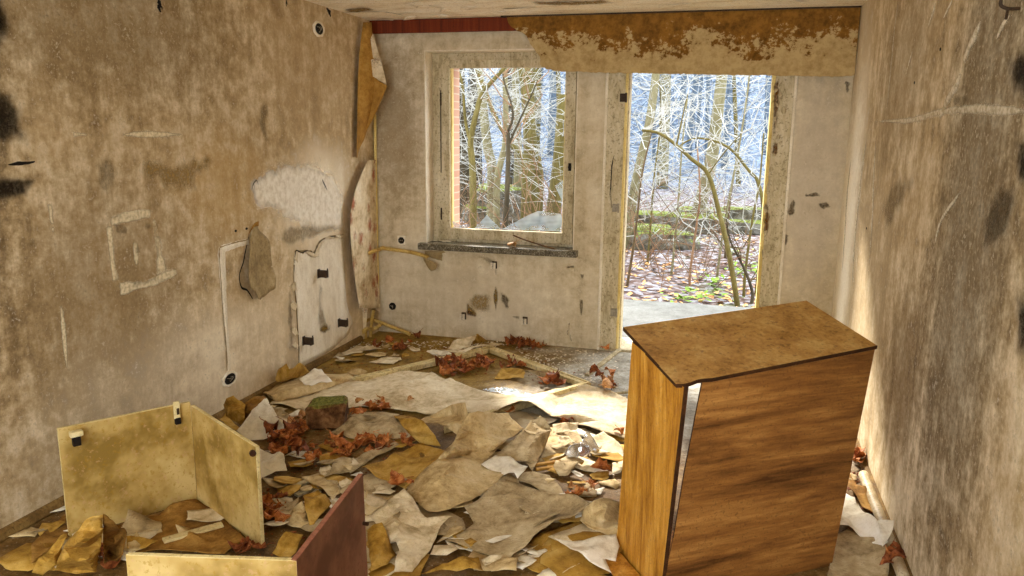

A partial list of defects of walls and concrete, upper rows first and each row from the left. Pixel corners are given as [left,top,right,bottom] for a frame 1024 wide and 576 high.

water stain [1012,56,1024,89]
water stain [0,97,21,139]
water stain [0,179,31,198]
water stain [984,192,1013,244]
peeling [252,166,352,366]